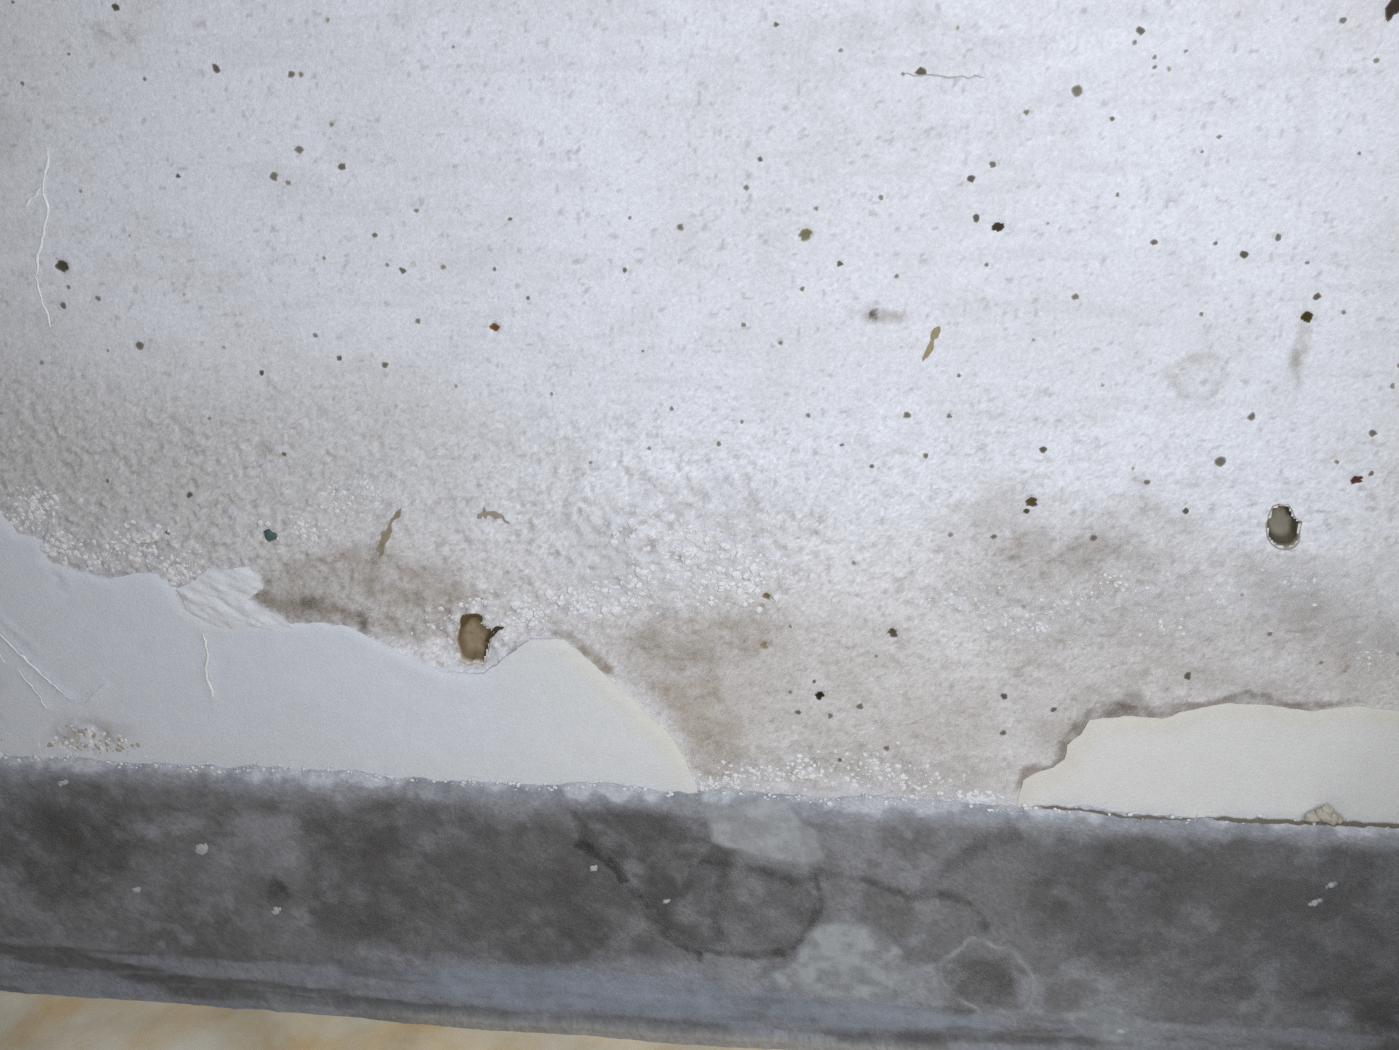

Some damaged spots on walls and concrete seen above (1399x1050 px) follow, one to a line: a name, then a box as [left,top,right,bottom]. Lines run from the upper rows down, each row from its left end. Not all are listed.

damp [276,474,399,545]
peeling [0,507,698,793]
damp [511,491,794,633]
damp [924,557,1328,650]
damp [694,741,1015,864]
peeling [1017,703,1399,824]
damp [771,923,1037,1028]